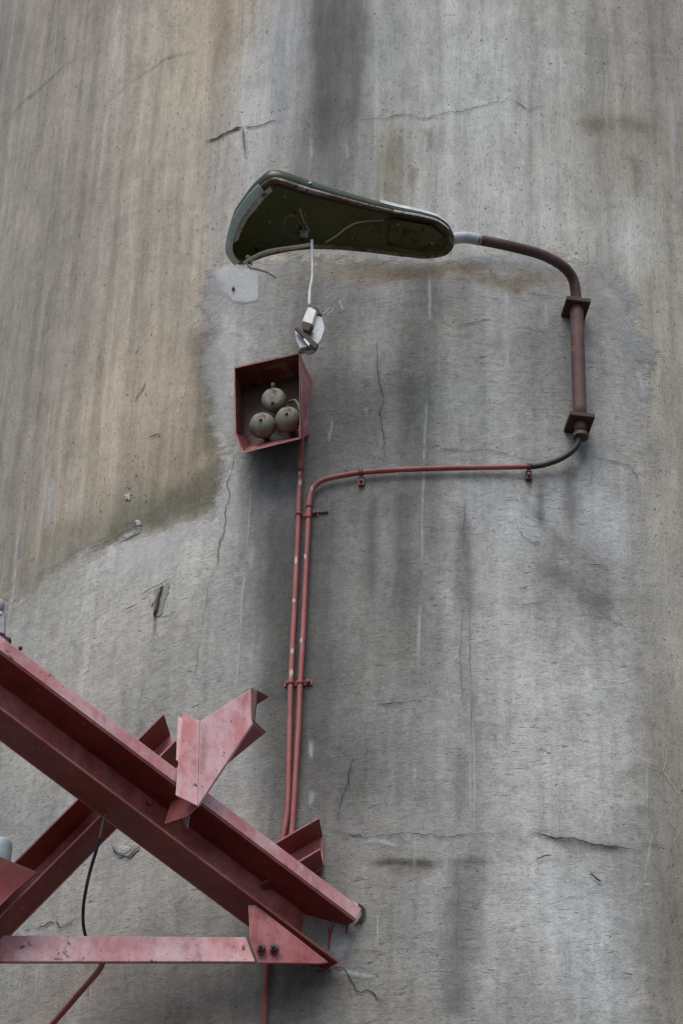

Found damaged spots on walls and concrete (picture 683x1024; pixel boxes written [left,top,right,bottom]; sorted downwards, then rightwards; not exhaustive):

crack [206,100,545,148]
spalling [126,580,170,629]
crack [333,756,483,841]
crack [329,949,384,1002]